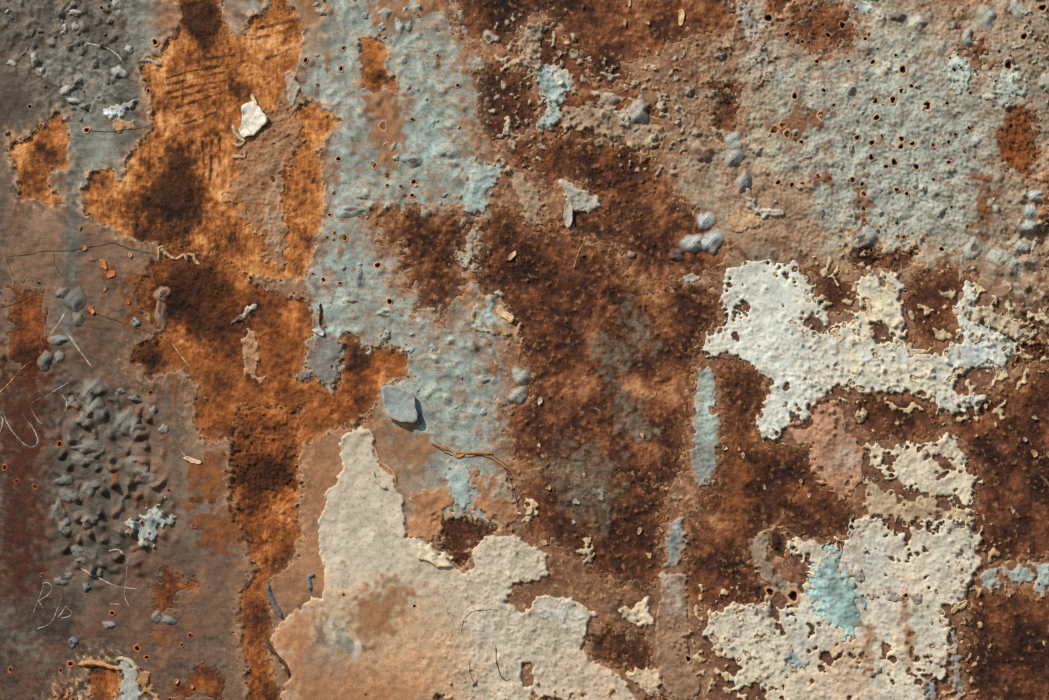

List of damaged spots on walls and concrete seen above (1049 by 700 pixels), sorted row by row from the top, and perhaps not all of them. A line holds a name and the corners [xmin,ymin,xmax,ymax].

peeling [735,0,812,89]
peeling [920,2,1049,113]
spalling [371,161,418,198]
peeling [453,7,698,276]
peeling [726,197,785,233]
rust [964,104,1049,286]
rust [81,0,435,700]
rust [359,0,871,612]
rust [853,335,1049,570]
peeling [115,644,173,700]
rust [586,618,655,672]
rust [962,583,1049,700]